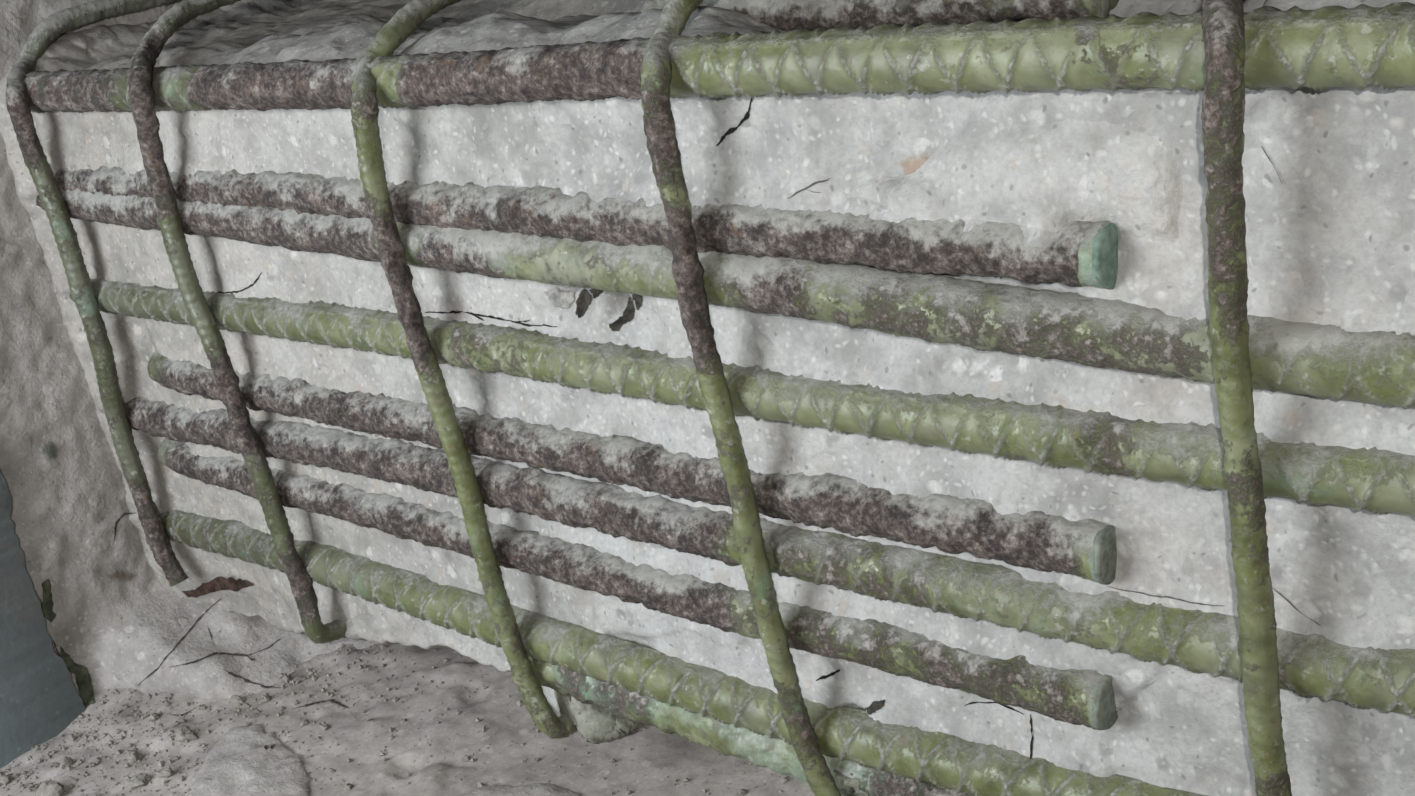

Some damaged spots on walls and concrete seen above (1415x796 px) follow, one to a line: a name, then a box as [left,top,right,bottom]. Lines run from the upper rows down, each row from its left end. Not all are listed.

spalling [545,288,603,318]
spalling [609,294,643,331]
peeling [41,579,56,622]
peeling [60,646,96,707]
spalling [862,700,885,715]